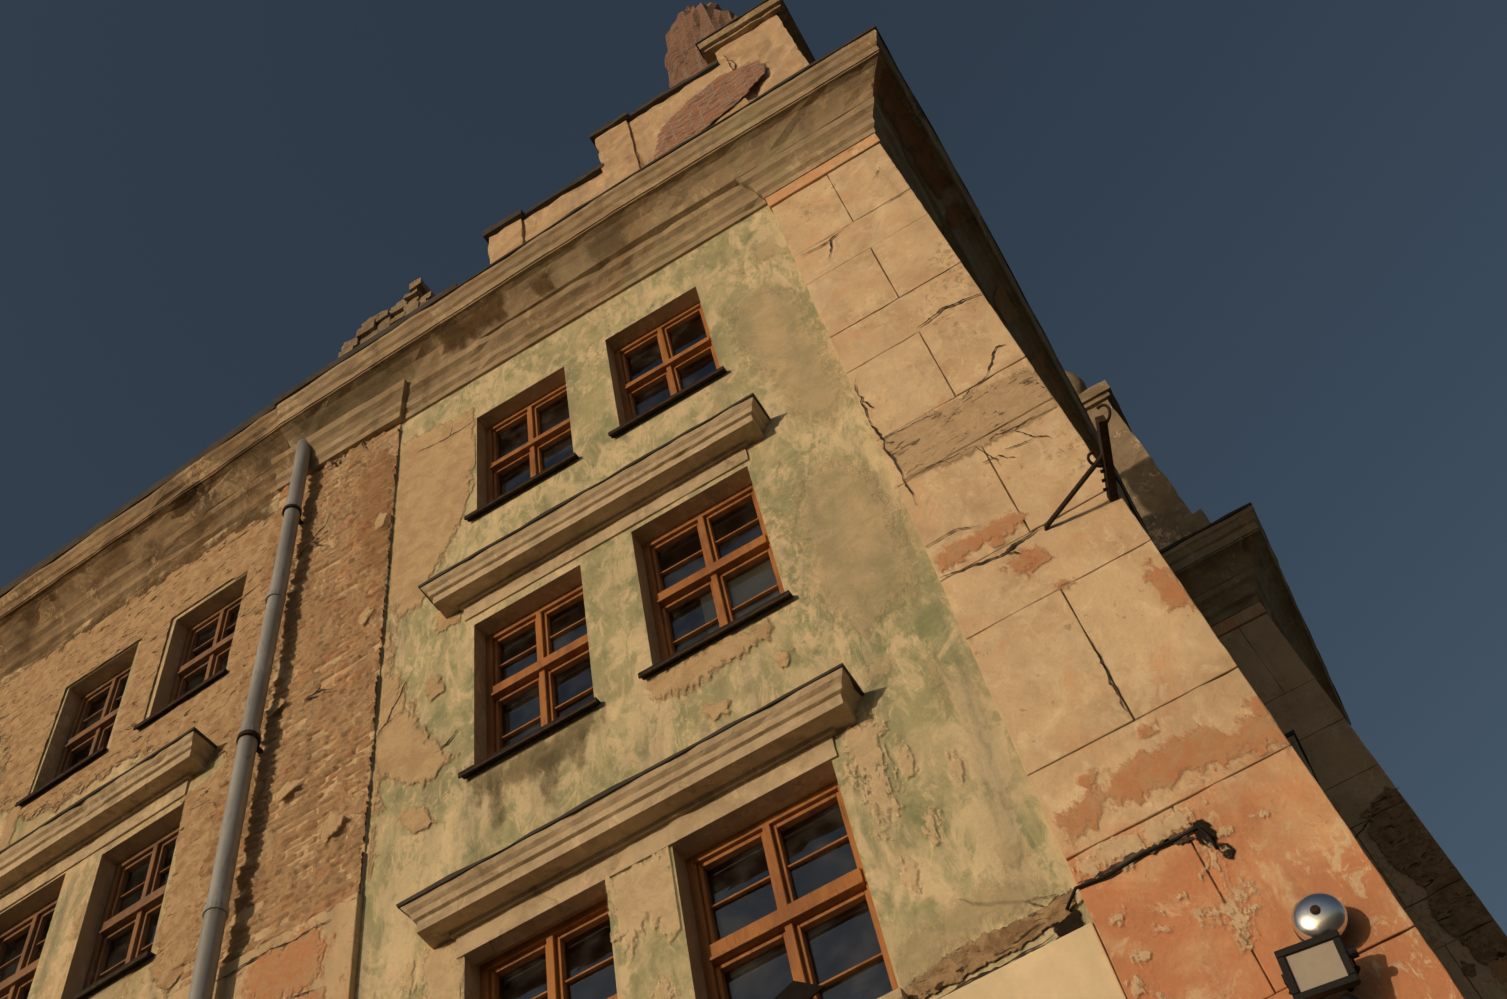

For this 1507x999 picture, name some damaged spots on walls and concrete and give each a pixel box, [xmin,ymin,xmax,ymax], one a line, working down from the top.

flaking render [624,59,765,168]
crack [802,226,847,256]
crack [916,293,982,329]
peeling [935,509,1051,576]
peeling [1142,558,1196,616]
flaking render [0,407,475,999]
crack [1085,635,1128,712]
peeling [837,711,917,841]
peeling [903,695,1288,999]
flaking render [1359,786,1507,976]